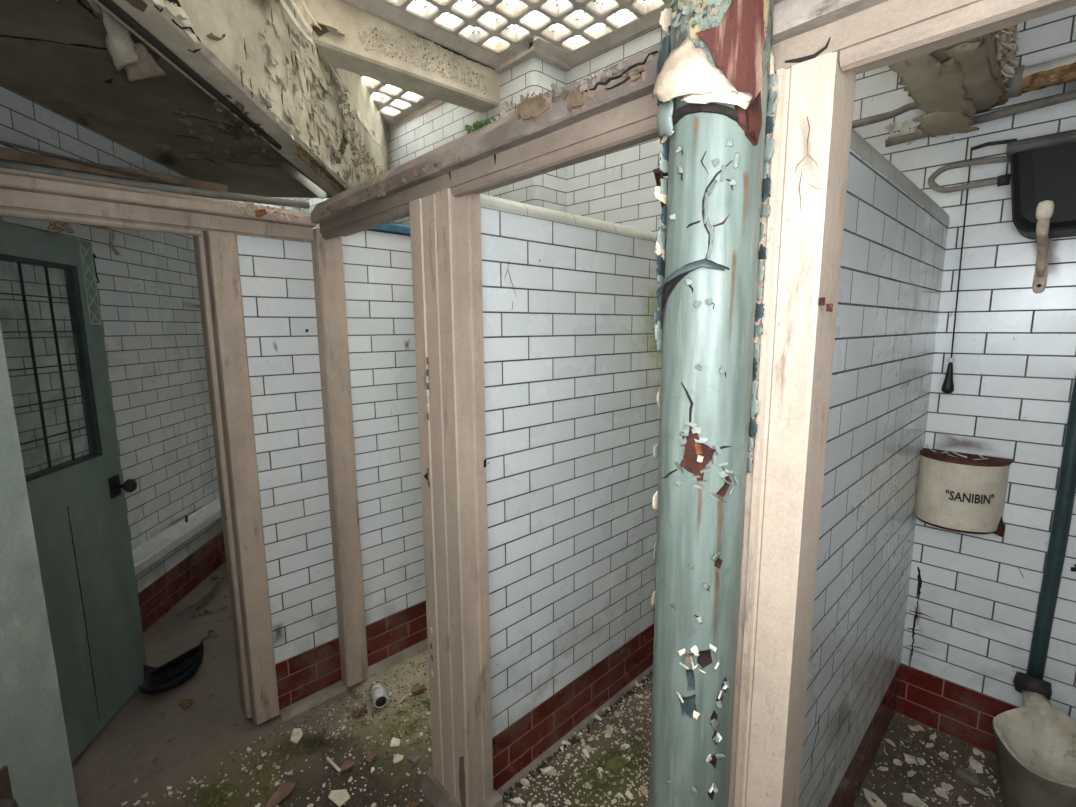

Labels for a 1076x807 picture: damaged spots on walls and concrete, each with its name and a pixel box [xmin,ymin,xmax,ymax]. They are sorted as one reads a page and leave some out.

crack [0,35,107,50]
crack [77,0,99,19]
peeling [87,0,166,84]
peeling [126,0,226,46]
peeling [213,0,460,217]
spalling [515,87,595,122]
spalling [885,25,1019,145]
crack [687,151,740,258]
peeling [624,0,778,522]
crack [906,567,932,662]
spalling [676,644,731,769]